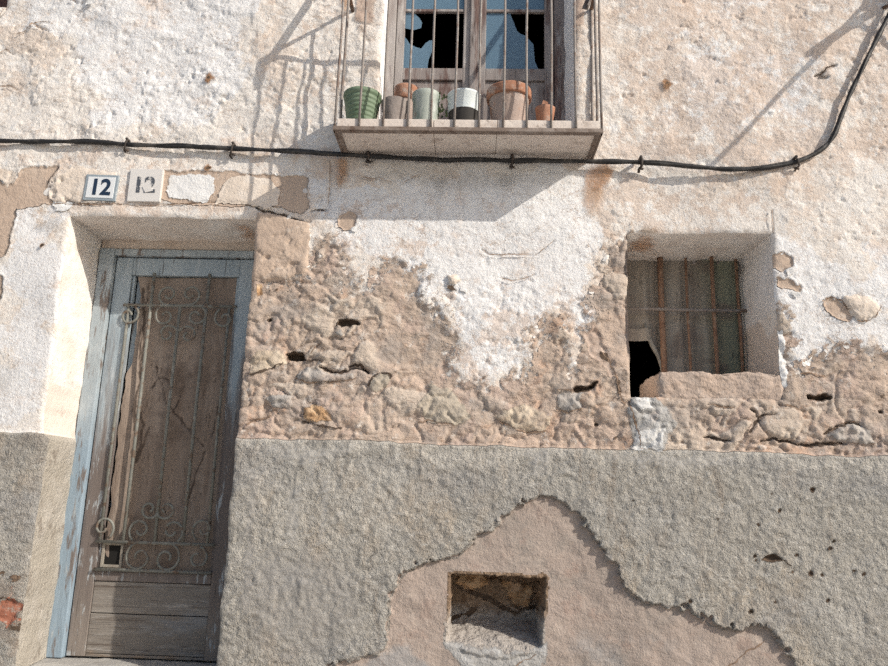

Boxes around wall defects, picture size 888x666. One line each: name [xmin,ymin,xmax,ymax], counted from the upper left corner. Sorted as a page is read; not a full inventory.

peeling [0,165,116,257]
peeling [142,168,309,219]
flaking render [237,211,888,457]
flaking render [0,571,23,631]
spalling [327,494,799,666]